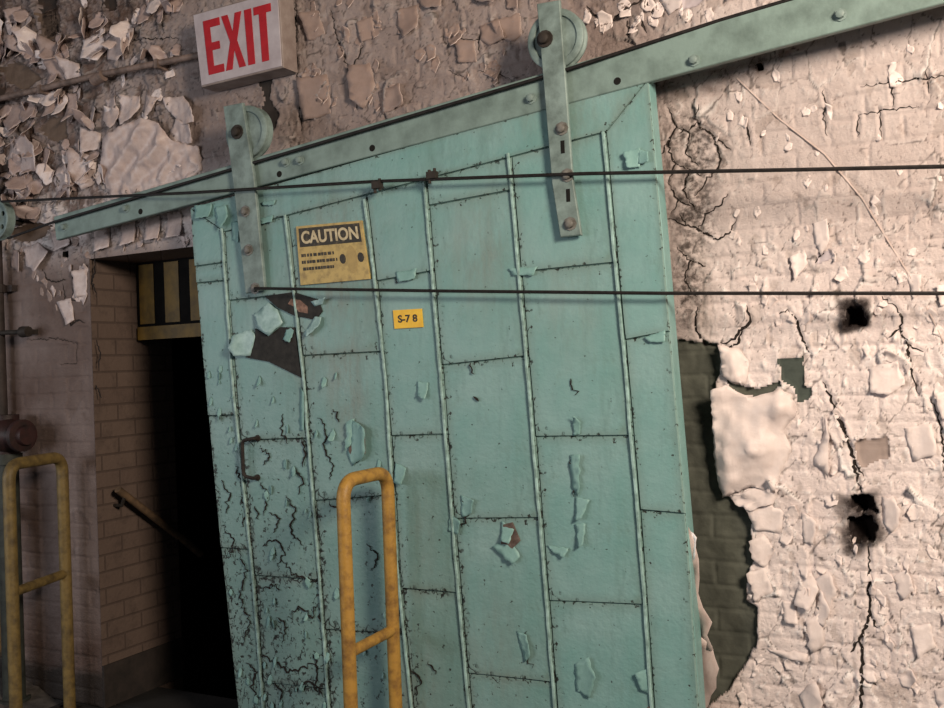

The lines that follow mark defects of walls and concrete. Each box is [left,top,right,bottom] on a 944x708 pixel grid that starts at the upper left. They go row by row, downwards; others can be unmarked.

peeling [0,0,202,325]
crack [661,105,752,348]
peeling [748,274,778,309]
peeling [790,219,849,282]
peeling [870,329,911,395]
peeling [913,285,944,337]
crack [823,382,864,492]
peeling [904,371,944,470]
crack [221,410,339,702]
peeling [677,339,890,708]
crack [851,537,878,708]
crack [410,663,437,696]